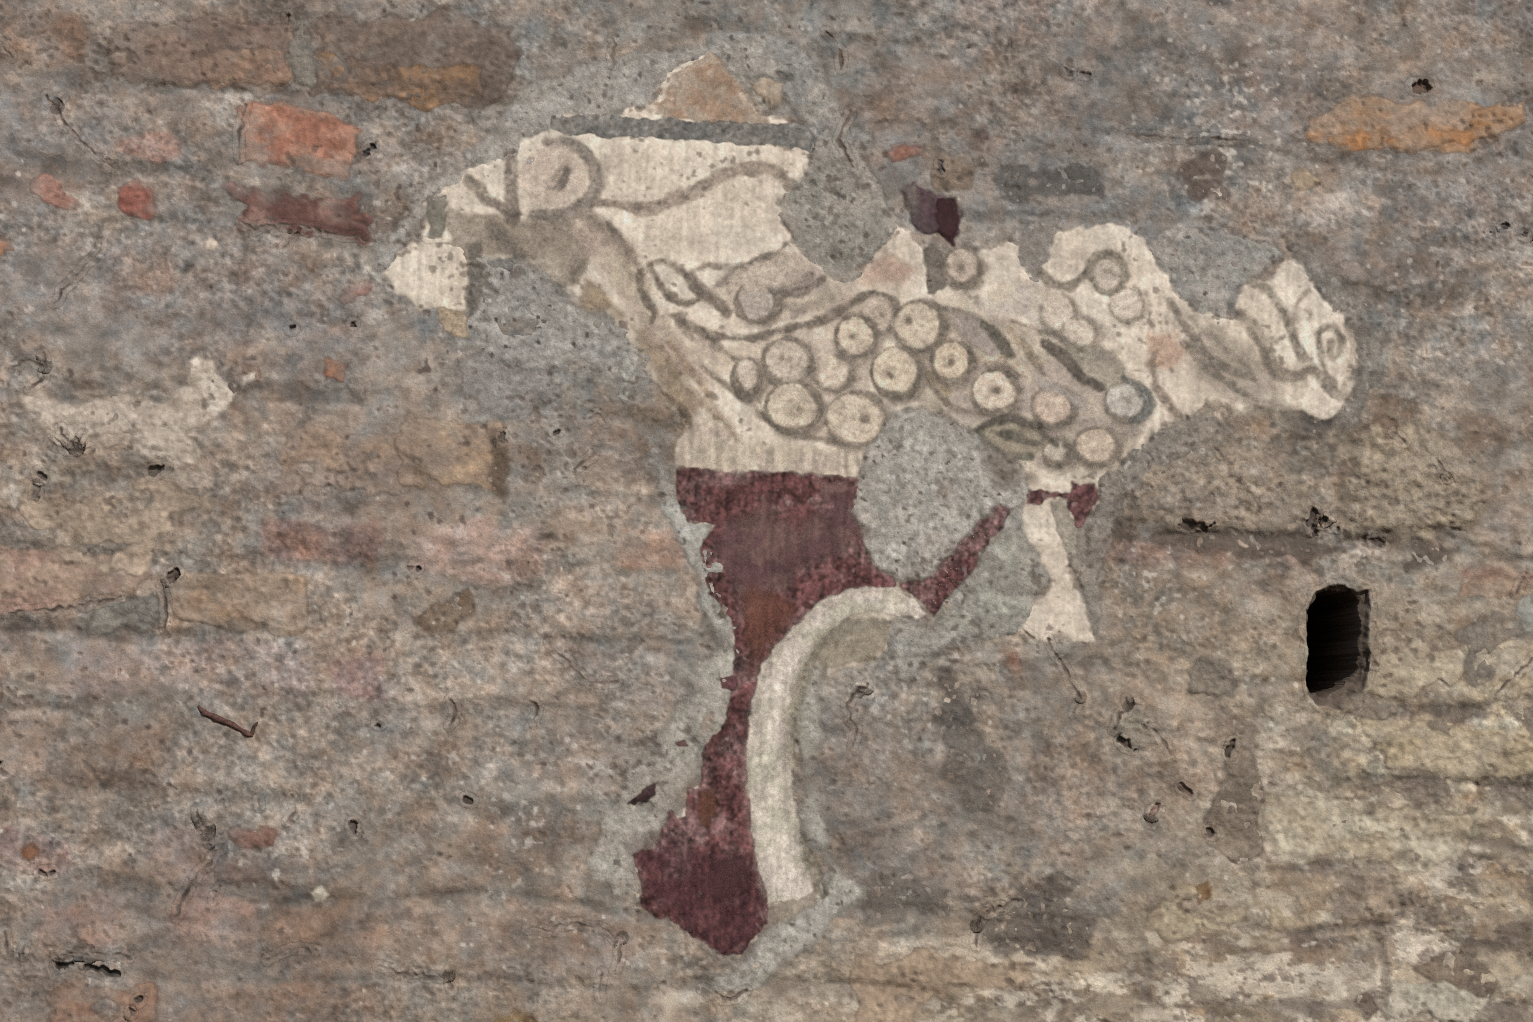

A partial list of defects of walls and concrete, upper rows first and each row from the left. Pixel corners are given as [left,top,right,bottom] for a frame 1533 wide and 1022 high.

peeling [883,145,975,246]